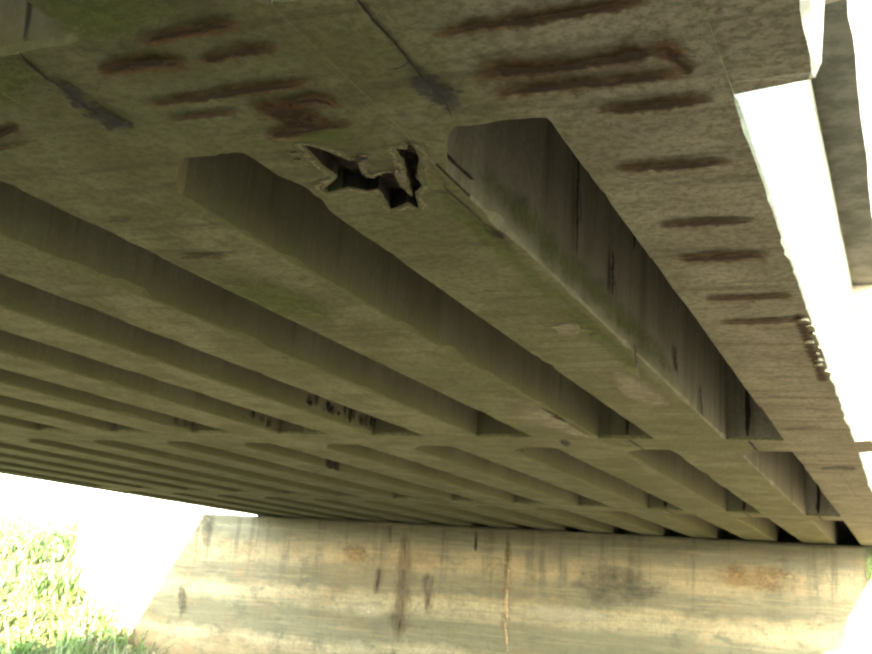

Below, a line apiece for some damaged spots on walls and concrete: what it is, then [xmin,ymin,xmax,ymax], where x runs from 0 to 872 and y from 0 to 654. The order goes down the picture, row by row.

crack [18,2,134,128]
rust [99,18,238,79]
crack [357,0,453,119]
rust [435,0,647,37]
rust [477,40,694,99]
rust [142,79,350,141]
rust [598,94,710,115]
spalling [290,142,432,212]
spalling [447,153,474,180]
rust [618,160,728,173]
rust [662,219,751,229]
leakage [502,543,511,643]